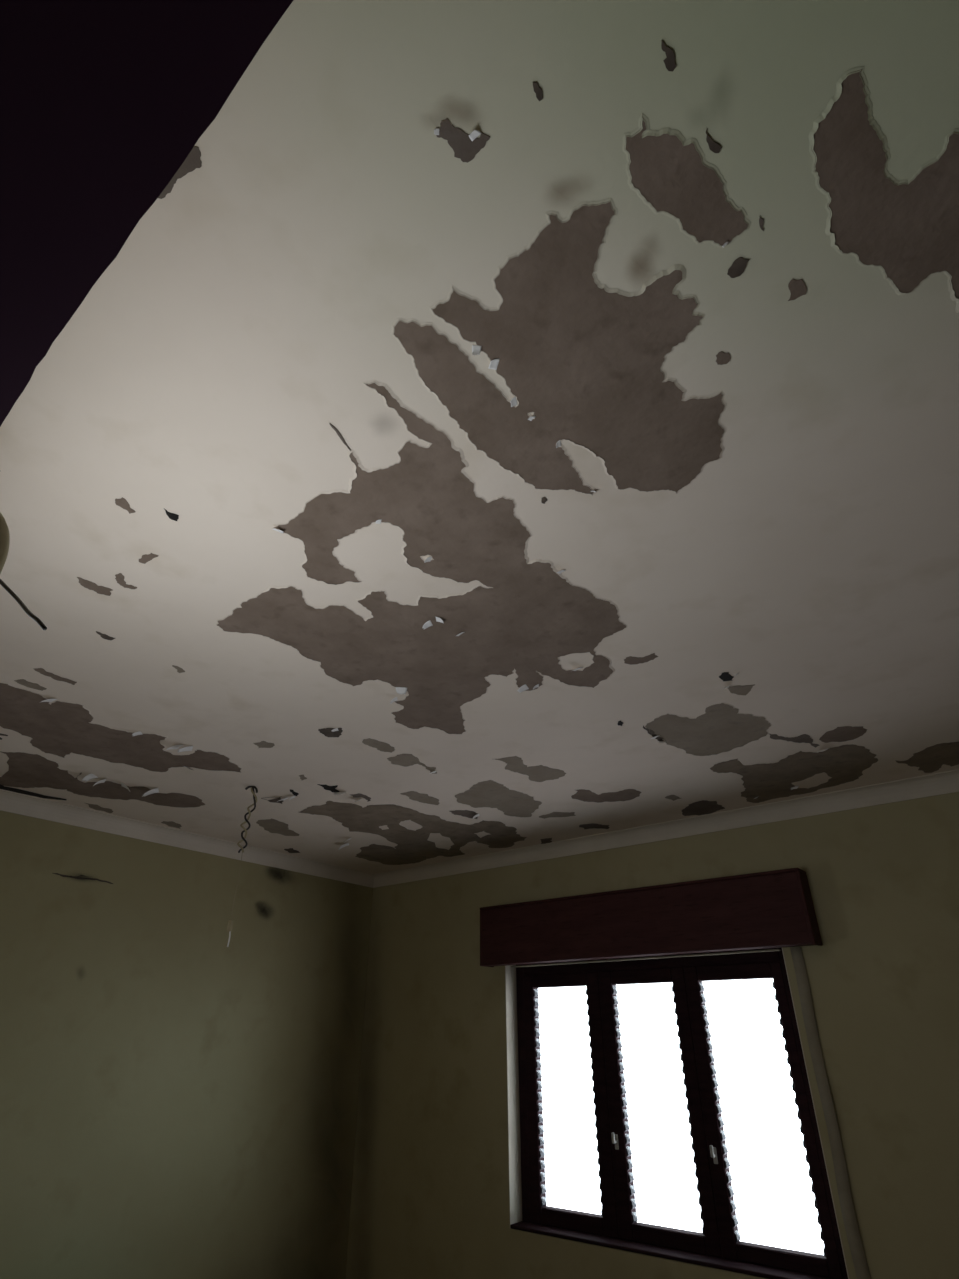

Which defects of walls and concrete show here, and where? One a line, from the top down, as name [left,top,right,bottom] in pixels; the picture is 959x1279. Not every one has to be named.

peeling [434,119,490,163]
peeling [622,113,764,248]
peeling [808,66,959,313]
spalling [727,257,750,278]
peeling [716,351,731,365]
peeling [216,198,727,734]
crack [0,784,67,800]
peeling [0,668,242,829]
peeling [256,756,641,865]
peeling [643,672,878,803]
peeling [895,742,959,773]